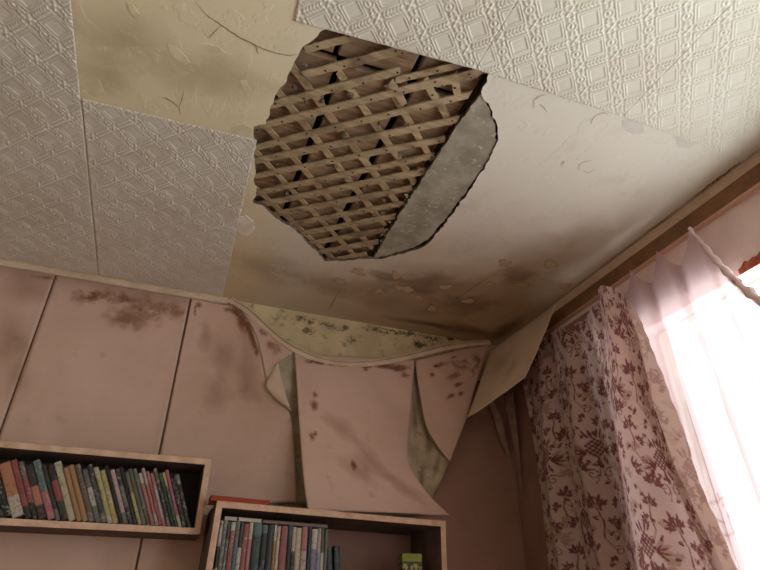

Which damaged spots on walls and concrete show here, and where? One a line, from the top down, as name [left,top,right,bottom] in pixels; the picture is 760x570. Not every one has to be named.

crack [196,3,297,56]
damp [297,315,355,343]